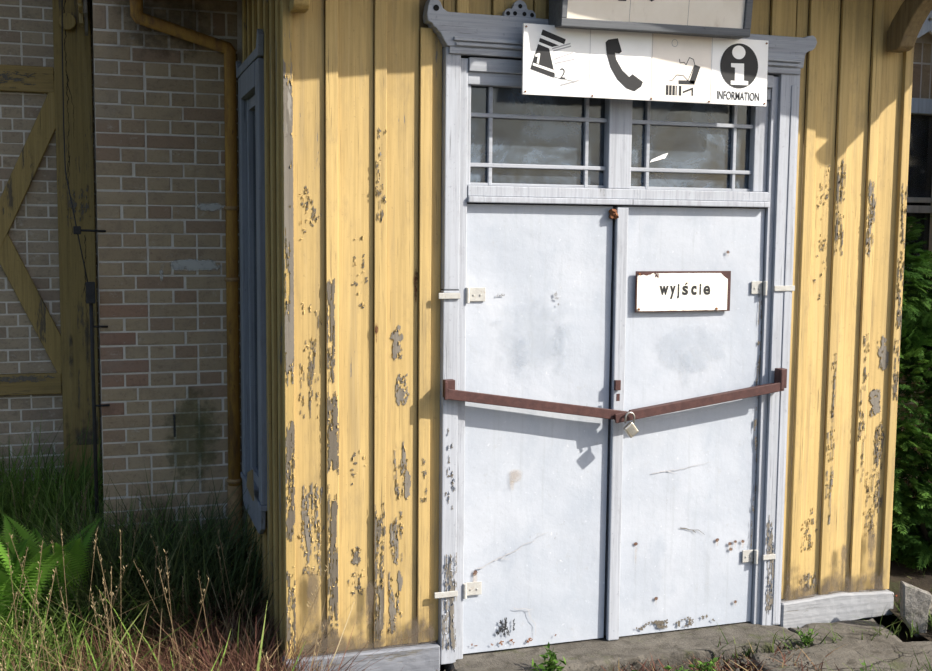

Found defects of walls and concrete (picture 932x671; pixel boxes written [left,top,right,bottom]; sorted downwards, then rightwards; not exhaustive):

peeling [814,160,846,281]
peeling [283,59,404,652]
peeling [394,441,411,500]
peeling [396,373,410,406]
peeling [826,353,837,524]
peeling [857,179,908,537]
peeling [442,552,457,652]
peeling [636,615,715,630]